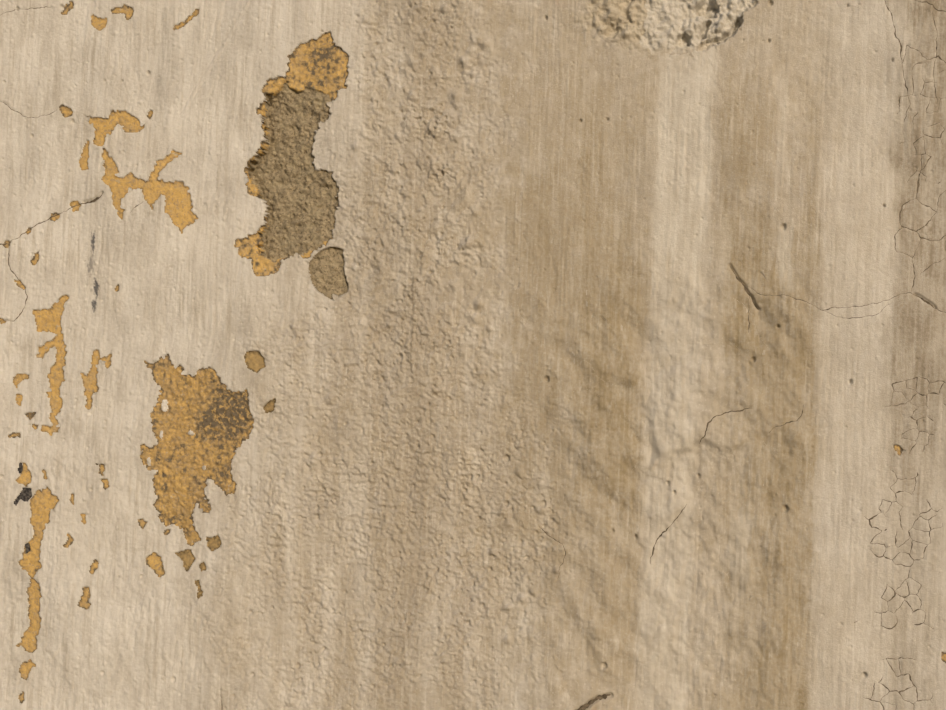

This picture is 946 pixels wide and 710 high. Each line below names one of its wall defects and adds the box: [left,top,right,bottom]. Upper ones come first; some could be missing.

peeling [91,4,134,31]
flaking render [567,0,758,60]
peeling [79,110,198,234]
flaking render [234,32,349,301]
crack [730,1,946,332]
peeling [13,295,69,436]
peeling [80,350,112,410]
peeling [263,398,276,413]
peeling [140,354,254,599]
peeling [16,463,86,680]
crack [577,694,611,710]